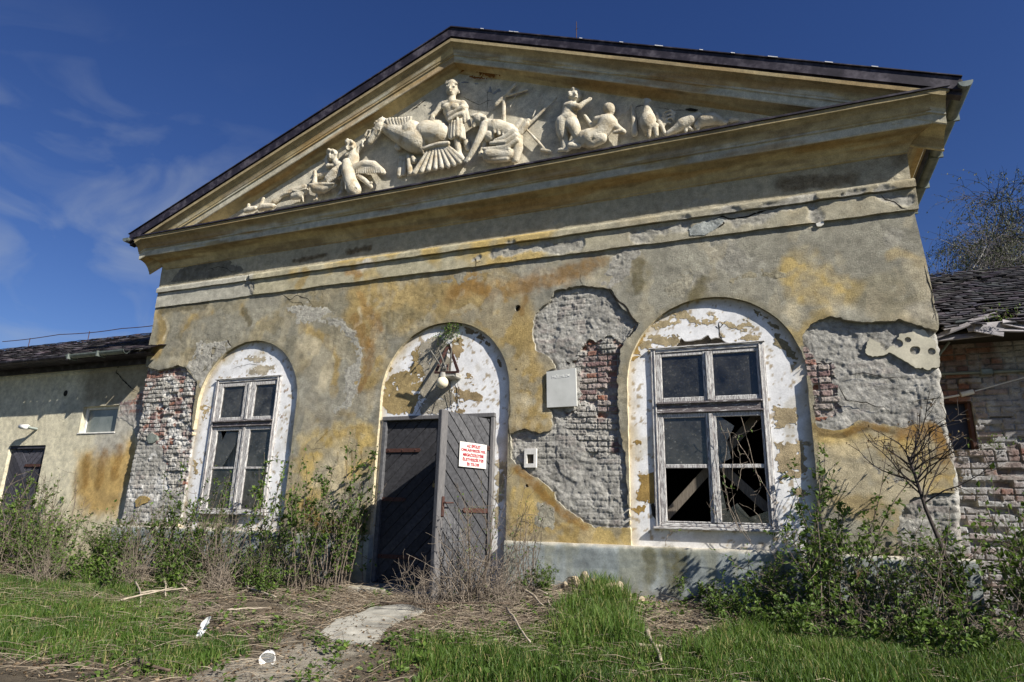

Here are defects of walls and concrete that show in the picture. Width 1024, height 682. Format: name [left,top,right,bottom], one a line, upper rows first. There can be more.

spalling [117,340,231,524]
peeling [244,355,276,376]
peeling [382,327,491,415]
spalling [494,247,966,558]